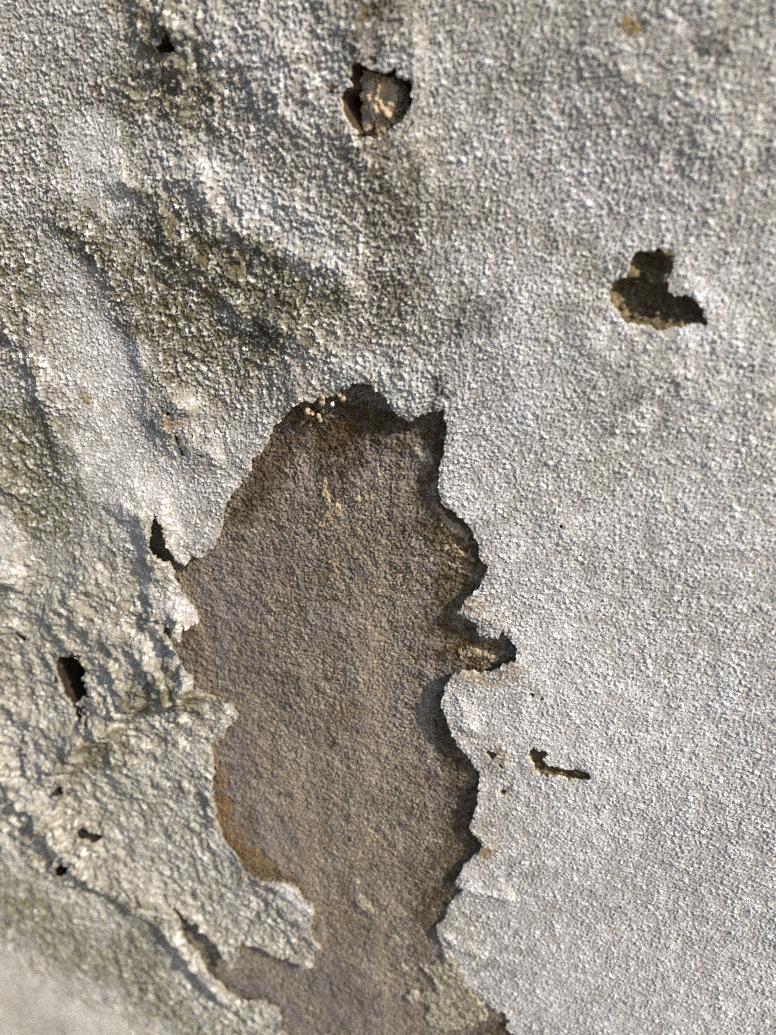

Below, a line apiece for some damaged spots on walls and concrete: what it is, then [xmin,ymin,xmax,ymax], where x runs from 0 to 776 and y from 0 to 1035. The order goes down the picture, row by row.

spalling [329,55,415,145]
spalling [601,240,717,331]
peeling [145,383,517,1035]
spalling [525,748,590,779]